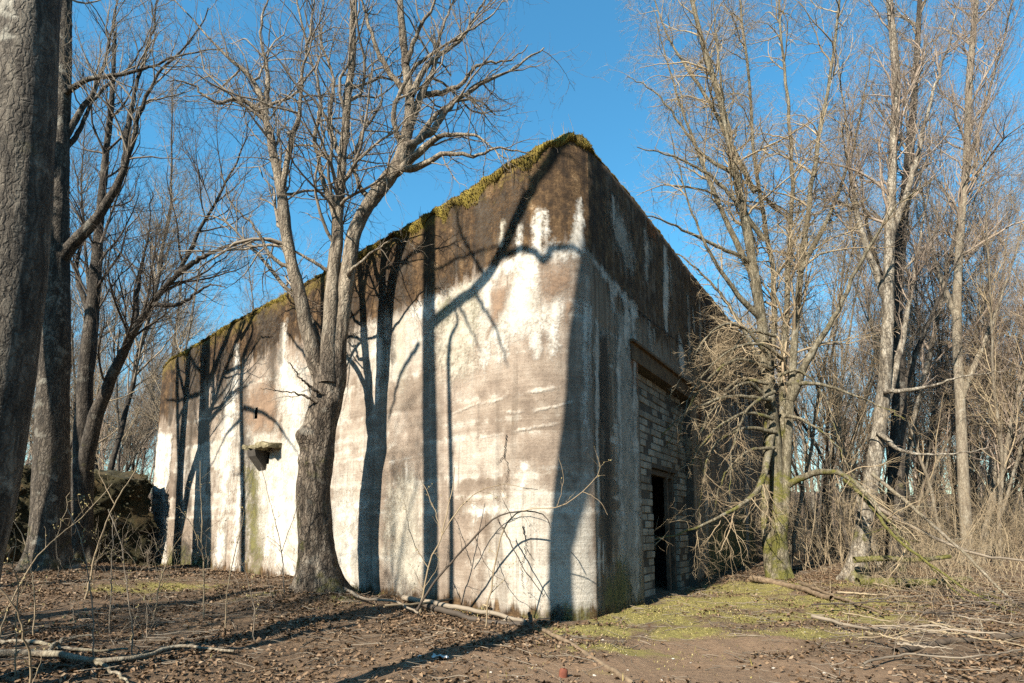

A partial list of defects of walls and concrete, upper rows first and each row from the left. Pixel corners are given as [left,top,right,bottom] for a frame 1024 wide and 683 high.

water stain [215,310,308,576]
water stain [348,195,672,600]